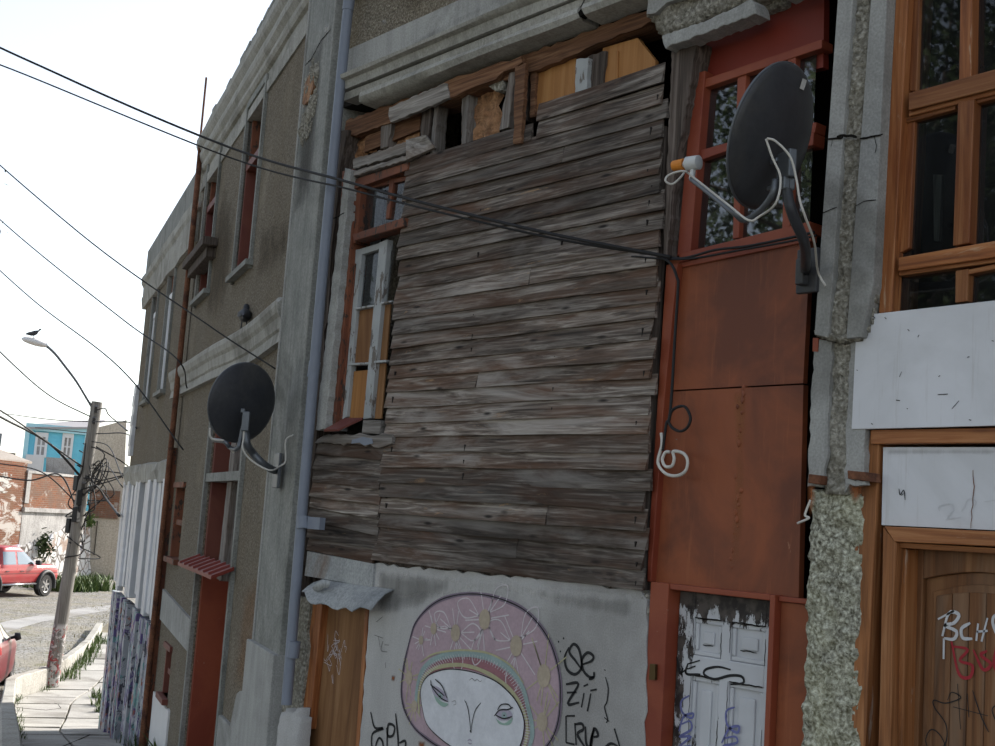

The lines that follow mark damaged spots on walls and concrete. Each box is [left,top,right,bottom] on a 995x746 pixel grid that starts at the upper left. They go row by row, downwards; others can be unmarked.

crack [824,134,883,152]
peeling [0,472,12,493]